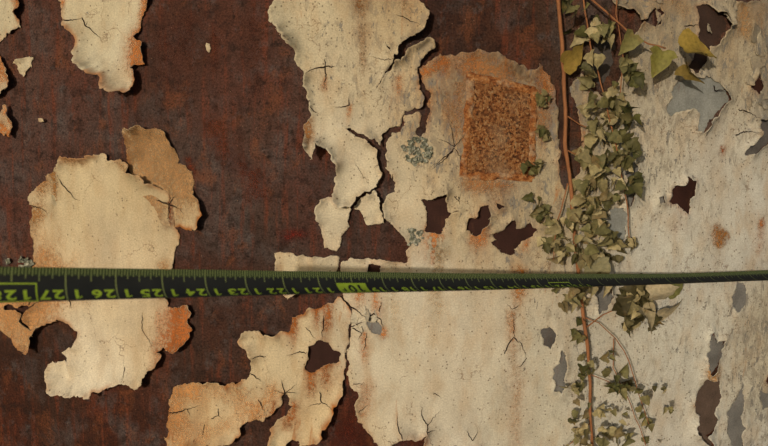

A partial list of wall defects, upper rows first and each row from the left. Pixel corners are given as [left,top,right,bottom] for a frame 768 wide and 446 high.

peeling [58,0,147,93]
corrosion [130,29,144,66]
peeling [28,125,202,269]
corrosion [119,125,195,224]
peeling [268,0,768,274]
peeling [0,298,192,399]
corrosion [167,382,201,446]
crack [250,356,297,410]
crack [340,296,384,352]
crack [421,393,440,446]
peeling [164,281,768,446]
crack [504,305,527,367]